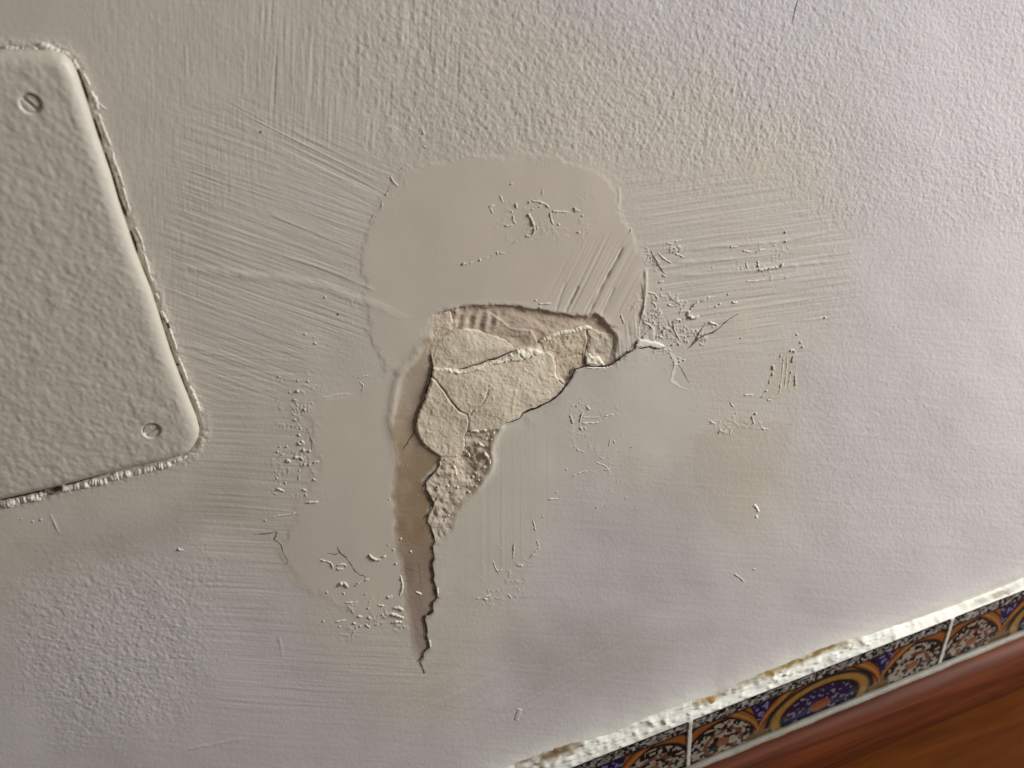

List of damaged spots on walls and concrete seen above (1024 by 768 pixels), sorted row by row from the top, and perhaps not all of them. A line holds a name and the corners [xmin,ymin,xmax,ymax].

spalling [403,299,625,546]
peeling [643,293,738,363]
crack [399,456,441,674]